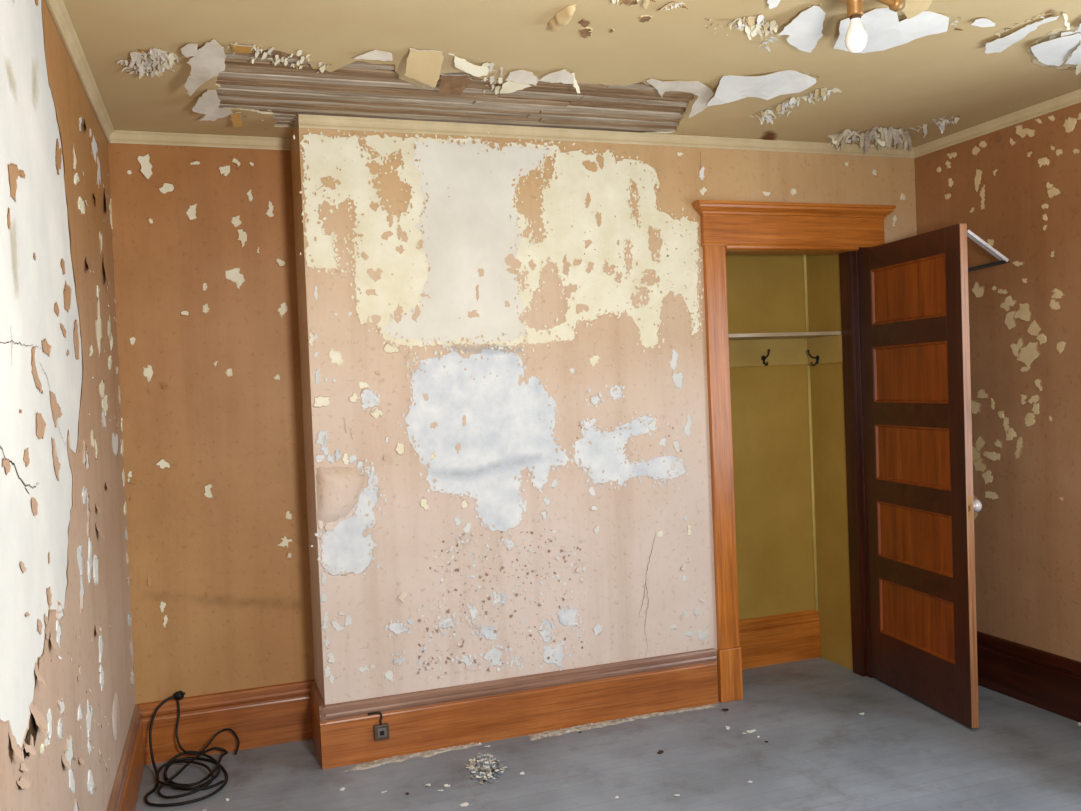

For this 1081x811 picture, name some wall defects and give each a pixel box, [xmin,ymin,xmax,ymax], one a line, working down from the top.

peeling [578,19,593,38]
peeling [610,0,688,23]
peeling [704,0,826,53]
peeling [833,0,1081,76]
peeling [972,112,1081,155]
peeling [1027,145,1080,167]
peeling [970,169,1000,213]
peeling [1041,182,1060,232]
peeling [117,39,841,684]
peeling [0,0,136,811]
peeling [971,282,1066,521]
crack [0,446,36,494]